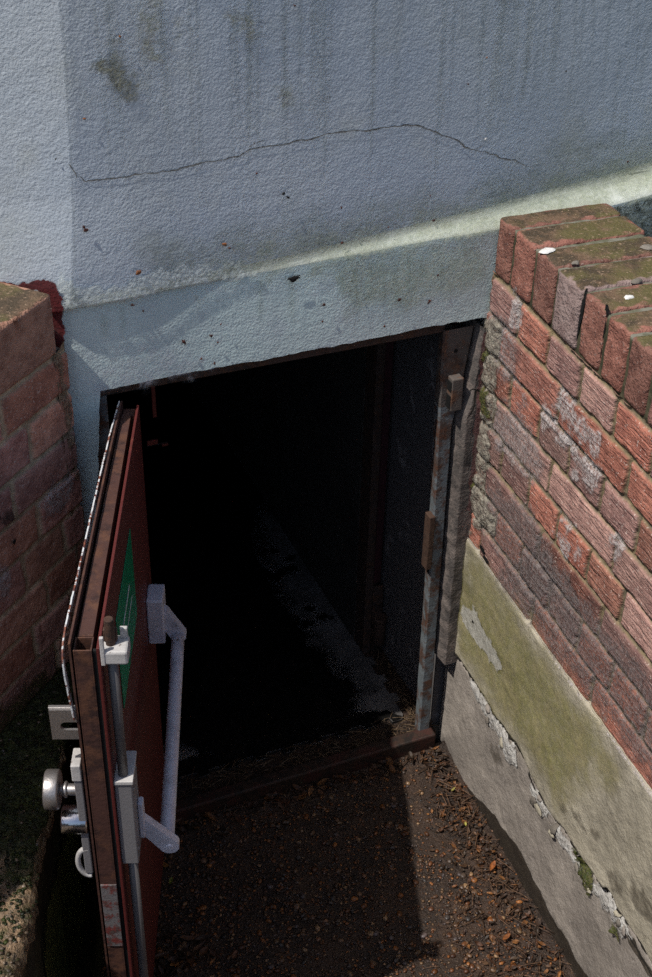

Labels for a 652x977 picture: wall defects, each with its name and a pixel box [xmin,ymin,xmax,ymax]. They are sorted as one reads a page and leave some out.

crack [68,124,531,182]
damp [484,490,652,769]
crack [455,654,652,976]